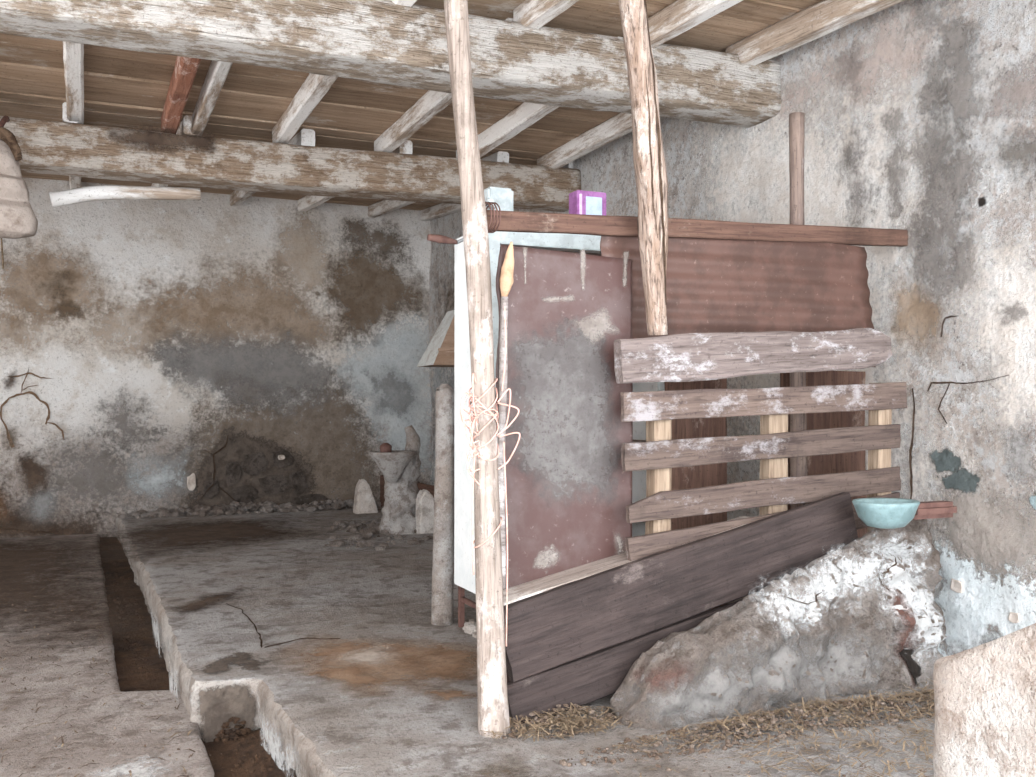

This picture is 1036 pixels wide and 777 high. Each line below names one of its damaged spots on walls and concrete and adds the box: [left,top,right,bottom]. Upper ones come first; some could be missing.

water stain [842,0,984,351]
water stain [0,211,428,375]
crack [0,369,64,449]
water stain [0,371,380,649]
water stain [371,372,414,414]
crack [909,375,1008,499]